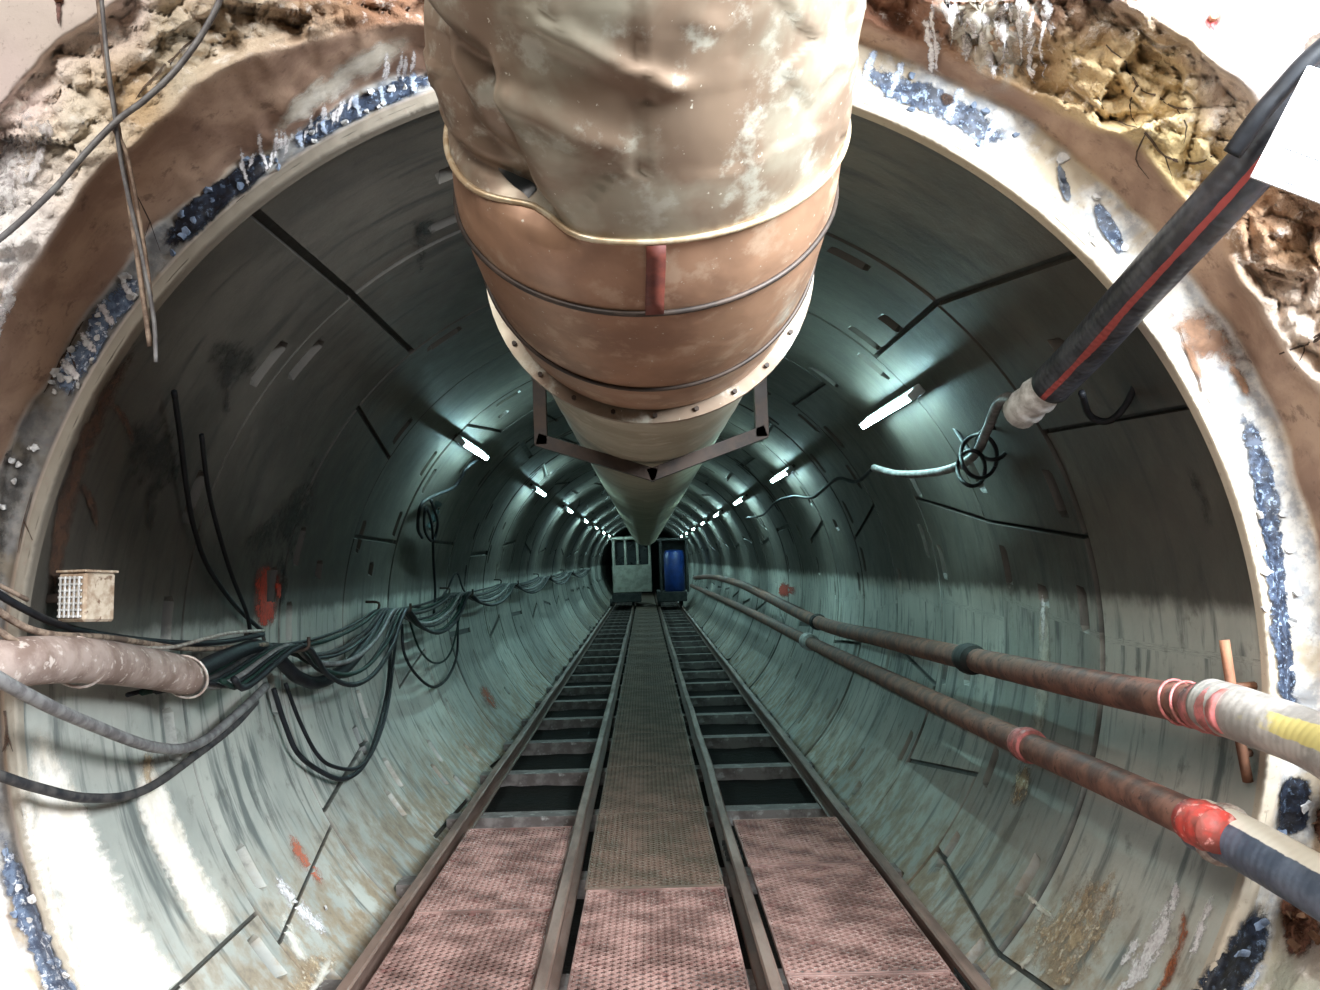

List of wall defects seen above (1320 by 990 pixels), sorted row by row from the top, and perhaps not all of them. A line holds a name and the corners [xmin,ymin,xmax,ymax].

peeling [863,50,1020,147]
peeling [165,134,281,257]
peeling [1056,152,1071,201]
peeling [1088,193,1129,254]
peeling [48,272,138,395]
peeling [0,443,40,547]
peeling [1240,413,1302,703]
peeling [1,843,77,990]
water stain [1117,883,1179,990]
corrosion [1157,913,1188,990]
water stain [1189,900,1212,954]